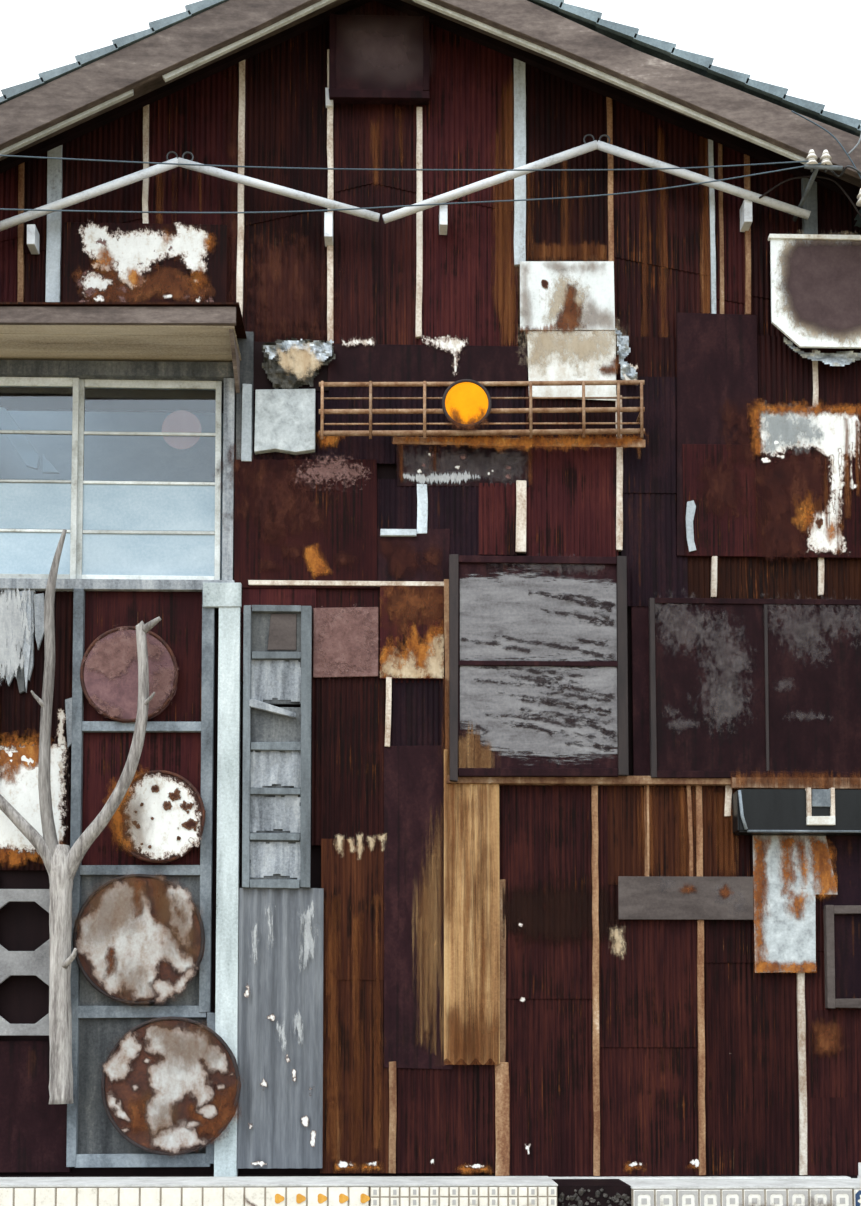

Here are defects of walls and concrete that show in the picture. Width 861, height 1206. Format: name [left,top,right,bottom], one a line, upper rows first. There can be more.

corrosion [75,248,212,302]
corrosion [204,63,340,378]
corrosion [493,72,606,346]
corrosion [750,402,861,560]
peeling [460,569,618,765]
corrosion [0,735,39,782]
corrosion [0,845,43,866]
corrosion [106,773,198,851]
corrosion [380,586,624,1065]
corrosion [709,772,861,898]
corrosion [753,835,838,973]
corrosion [189,1085,239,1139]